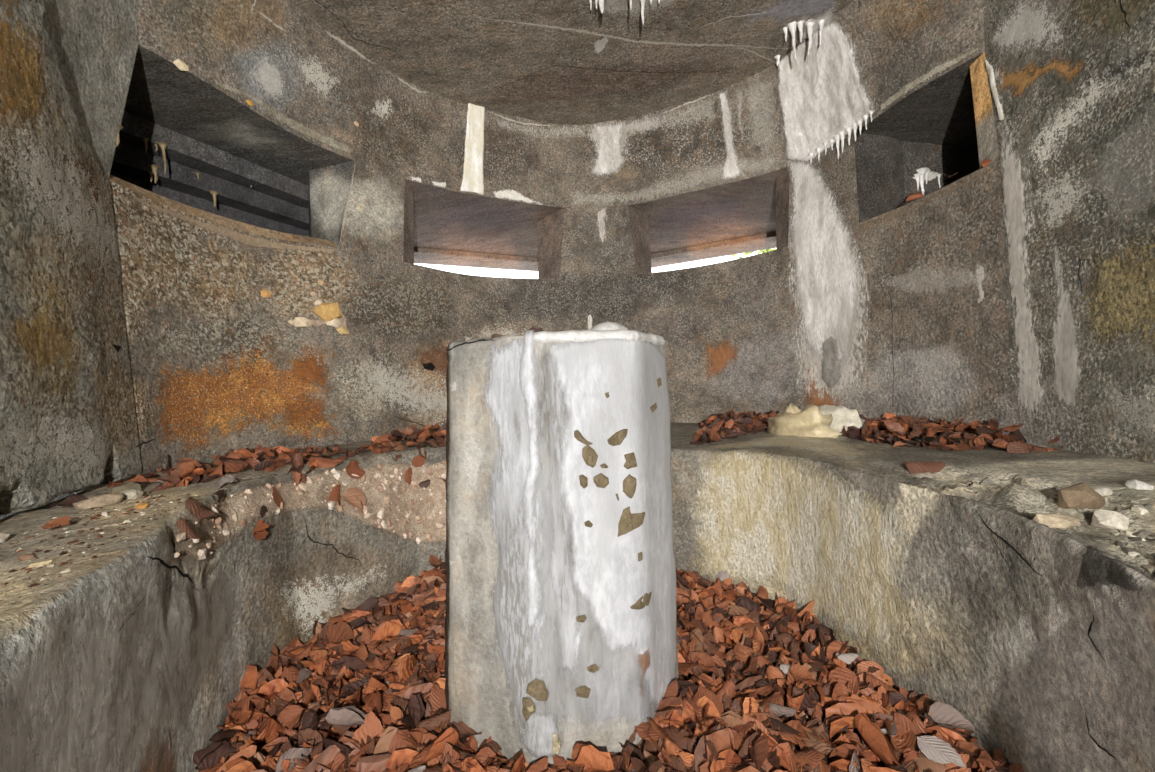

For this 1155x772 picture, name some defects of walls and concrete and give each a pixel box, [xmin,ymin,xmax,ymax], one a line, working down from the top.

corrosion [0,0,45,120]
leakage [588,117,659,153]
corrosion [998,60,1081,97]
leakage [1024,41,1155,233]
crack [1119,0,1130,40]
leakage [788,161,869,401]
leakage [1052,247,1081,405]
corrosion [150,335,338,455]
leakage [461,315,677,757]